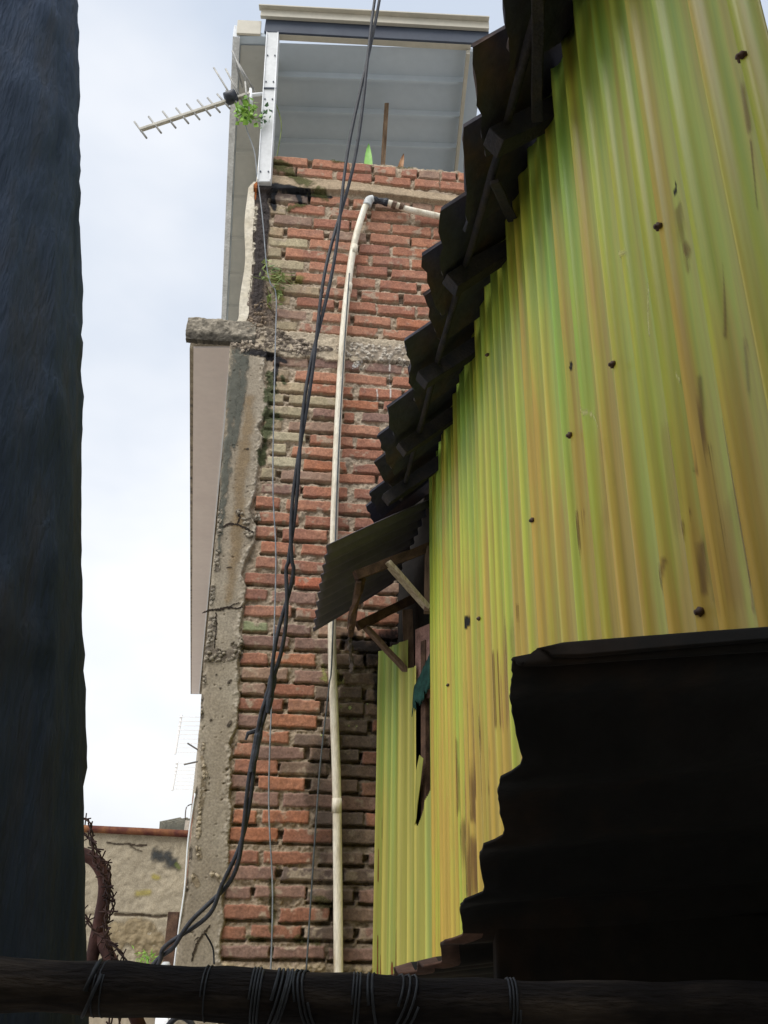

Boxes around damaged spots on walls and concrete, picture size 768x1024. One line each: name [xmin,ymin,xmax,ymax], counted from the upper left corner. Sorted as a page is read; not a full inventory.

crack [218,499,254,533]
crack [203,602,243,649]